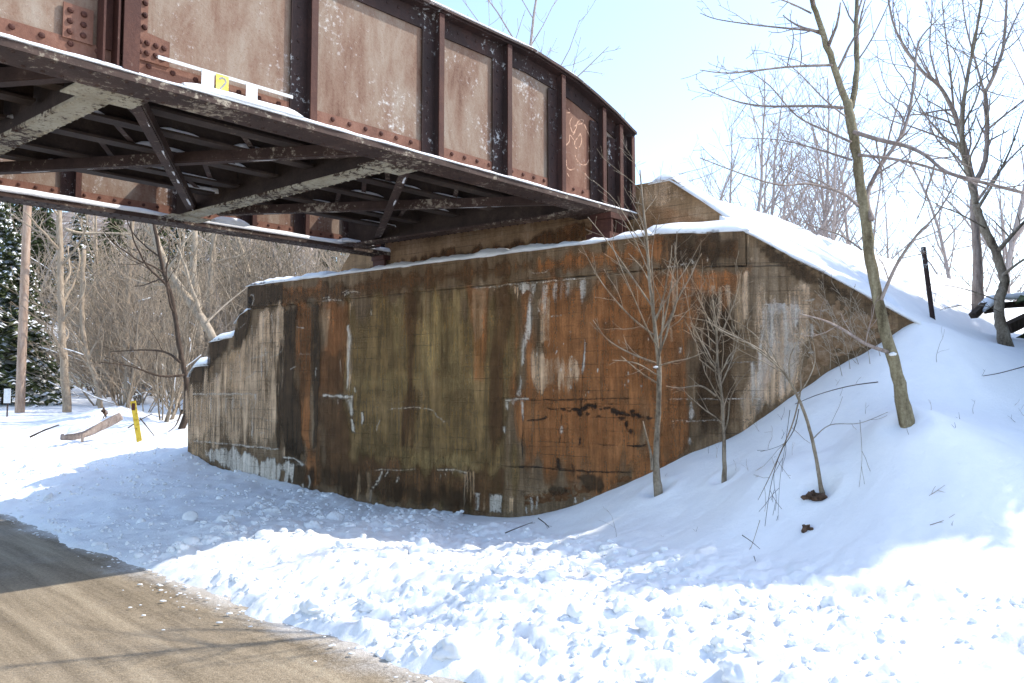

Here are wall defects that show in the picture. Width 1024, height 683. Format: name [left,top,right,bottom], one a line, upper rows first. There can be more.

damp [185,282,513,515]
rust [282,236,731,495]
damp [489,278,585,447]
crack [506,397,683,473]
damp [689,245,855,432]